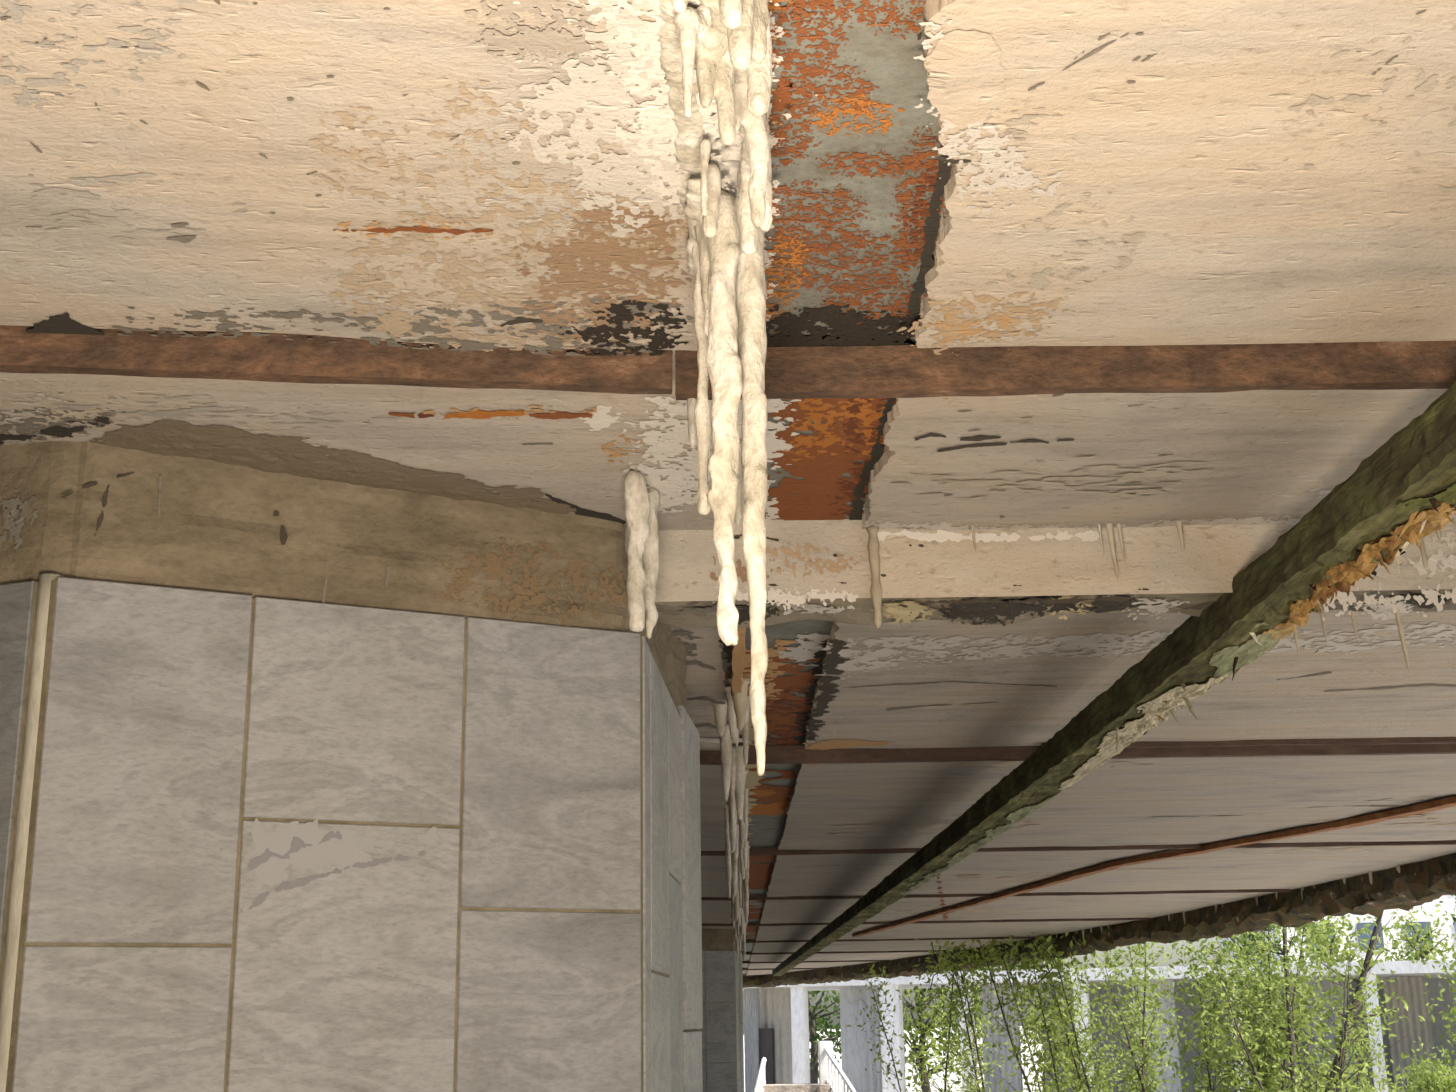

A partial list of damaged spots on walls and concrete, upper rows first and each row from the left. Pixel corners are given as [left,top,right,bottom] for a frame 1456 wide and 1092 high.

corrosion [334,215,493,240]
water stain [112,0,743,356]
efflorescence [764,1,792,322]
corrosion [765,0,955,347]
corrosion [389,405,597,422]
water stain [579,396,713,639]
corrosion [767,398,896,520]
water stain [710,542,1190,680]
spalling [932,585,1149,626]
spalling [1322,595,1378,609]
water stain [1262,515,1456,657]
corrosion [725,639,893,816]